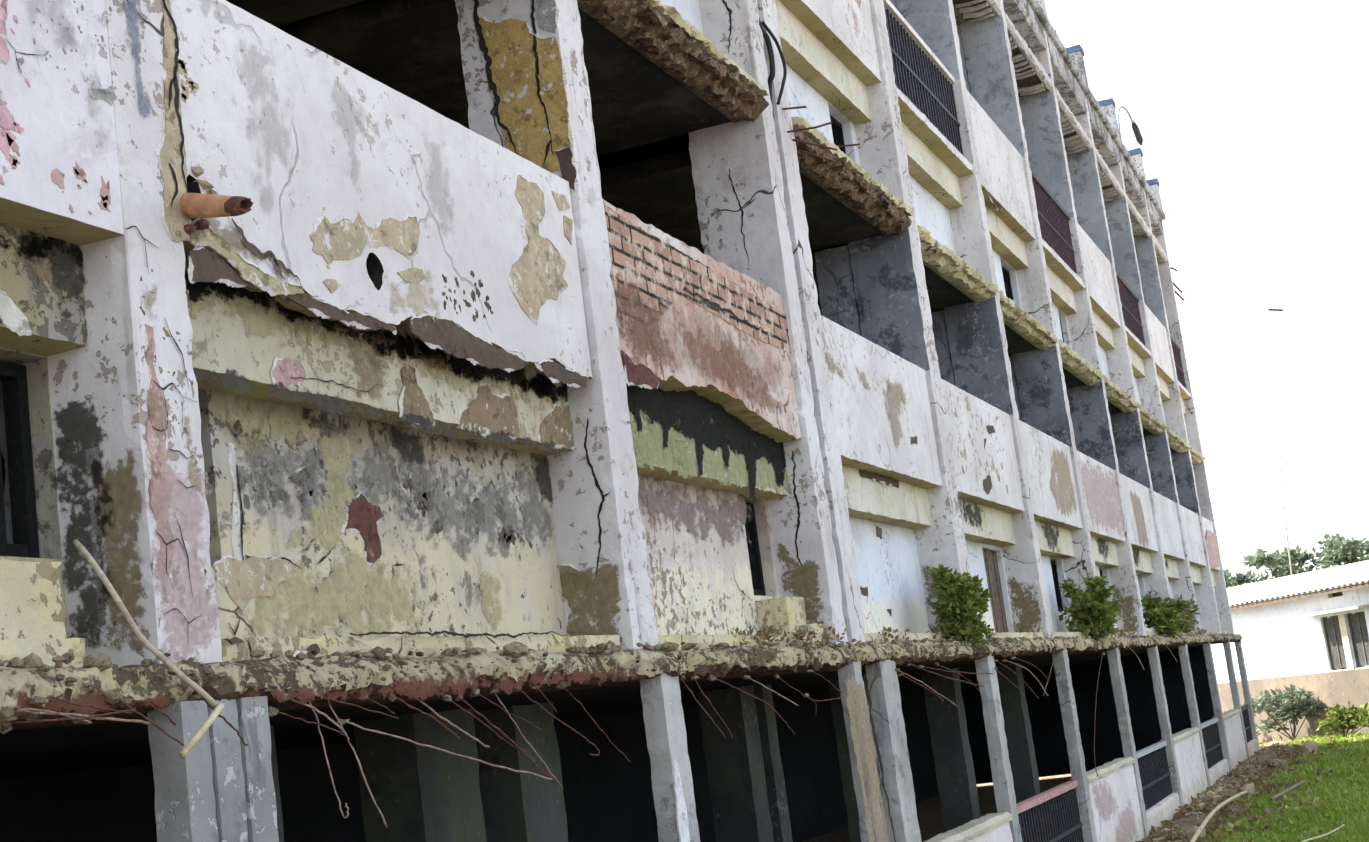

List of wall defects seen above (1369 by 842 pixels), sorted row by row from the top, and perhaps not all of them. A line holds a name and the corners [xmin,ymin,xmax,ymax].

peeling [0,88,24,186]
mould [0,232,85,319]
peeling [50,162,111,215]
crack [163,0,188,207]
flaking render [155,0,589,451]
crack [473,0,554,162]
flaking render [604,206,810,413]
crack [152,319,252,658]
crack [584,418,610,579]
leakage [626,384,786,546]
corrosion [4,689,170,720]
spalling [2,696,184,746]